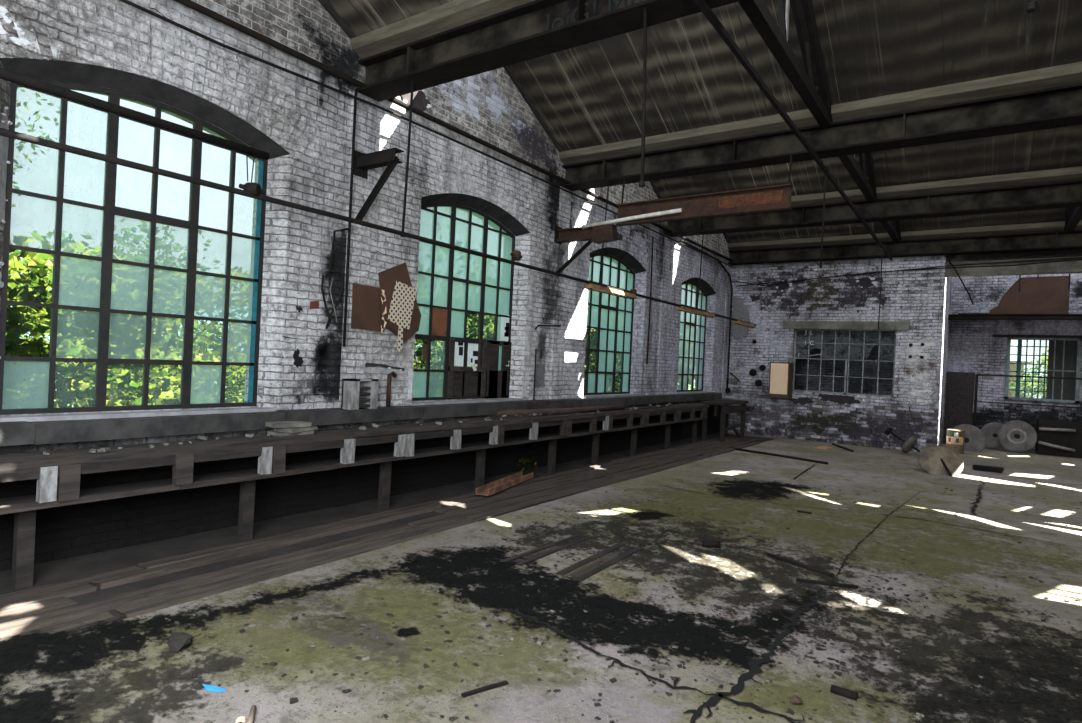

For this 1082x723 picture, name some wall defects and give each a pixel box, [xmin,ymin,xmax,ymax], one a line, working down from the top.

corrosion [718,190,783,209]
peeling [749,266,815,319]
peeling [828,264,899,316]
crack [514,477,1080,723]